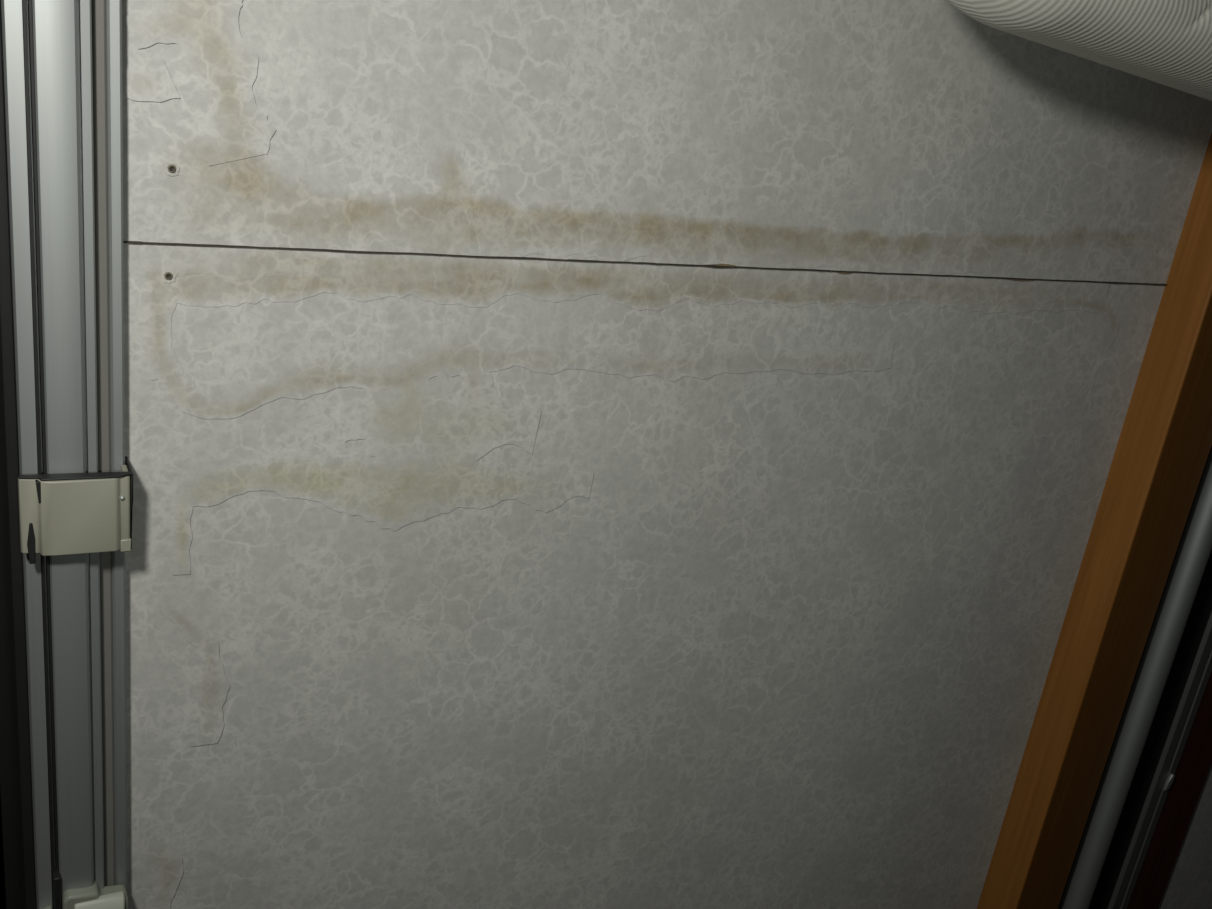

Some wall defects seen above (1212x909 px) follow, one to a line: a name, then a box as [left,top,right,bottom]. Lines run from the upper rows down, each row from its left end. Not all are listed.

leakage [123,0,1165,575]